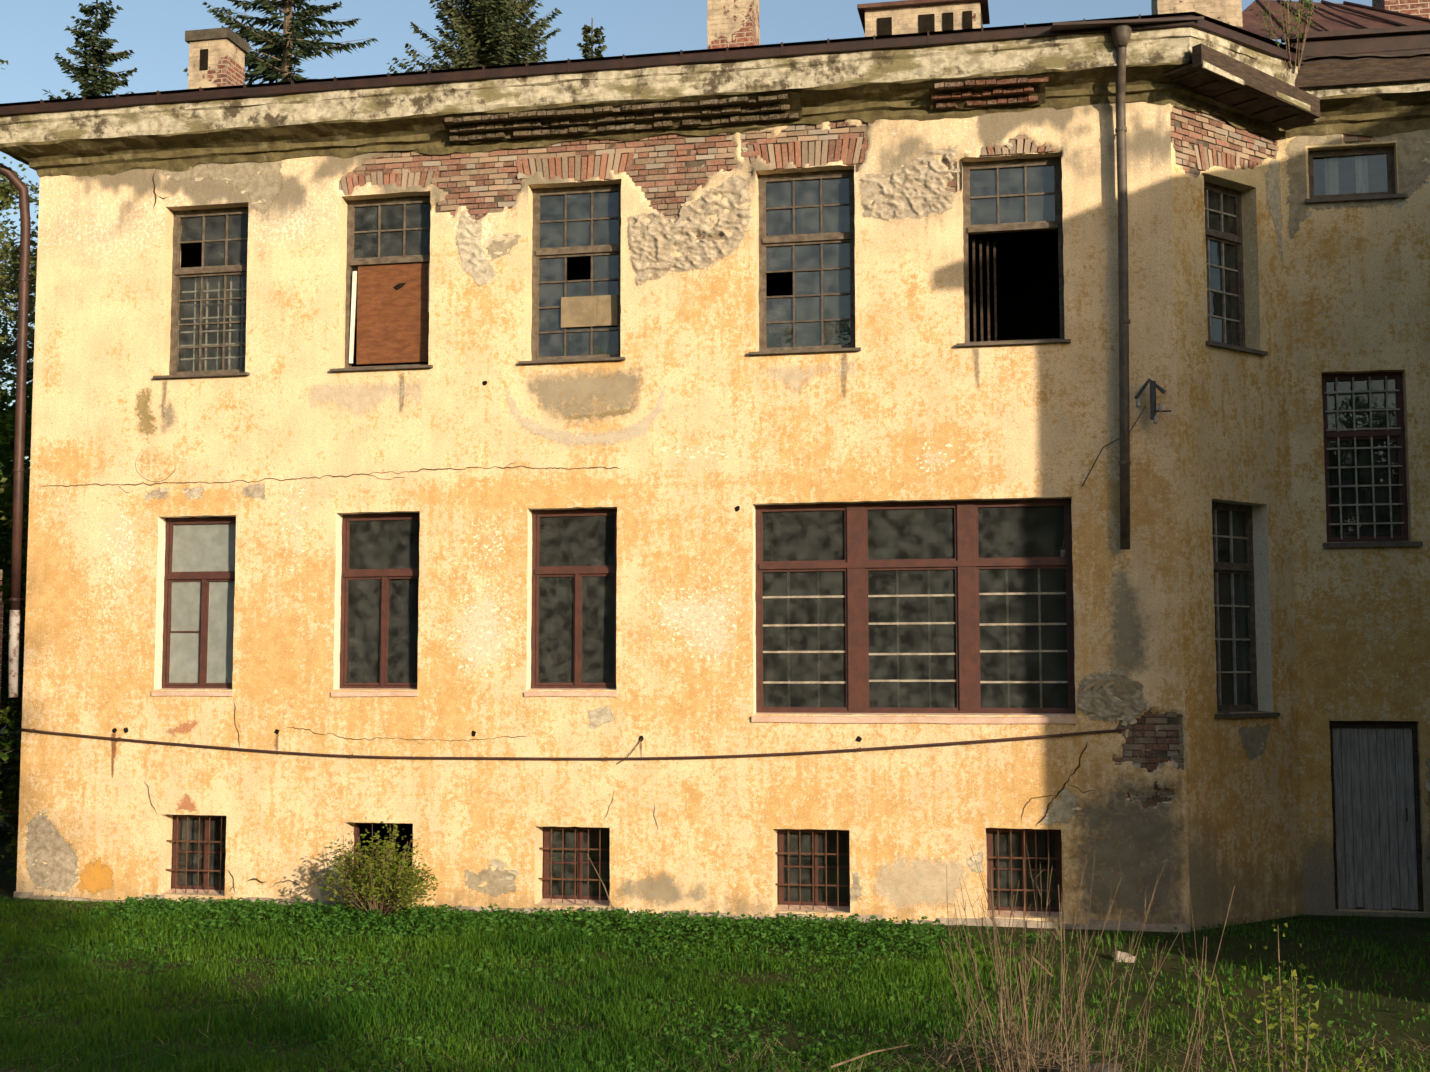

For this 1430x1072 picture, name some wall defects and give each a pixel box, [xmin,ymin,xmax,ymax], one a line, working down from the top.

flaking render [339,120,963,287]
flaking render [1170,106,1430,268]
crack [40,462,621,493]
peeling [647,585,741,664]
crack [1021,741,1096,825]
flaking render [1100,677,1184,808]
spalling [22,809,113,894]
spalling [464,859,520,897]